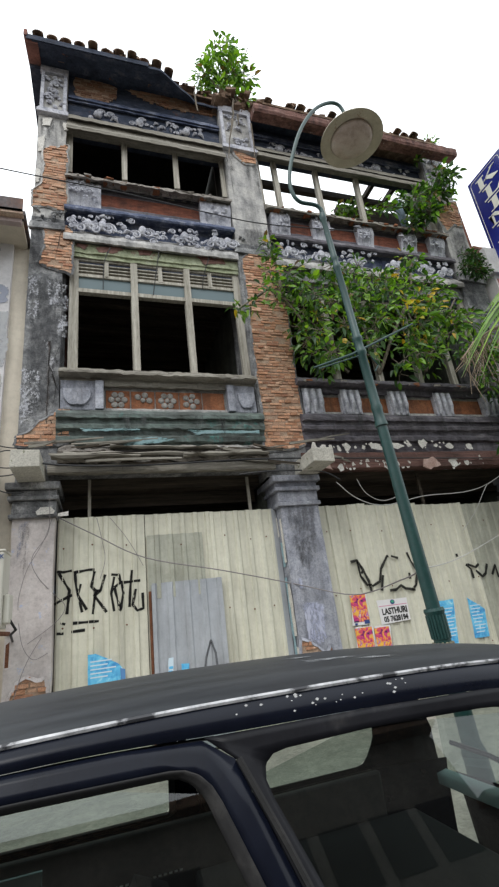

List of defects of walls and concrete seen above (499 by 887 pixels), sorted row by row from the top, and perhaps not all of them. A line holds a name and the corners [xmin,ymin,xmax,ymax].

flaking render [73,77,117,103]
flaking render [128,89,217,117]
flaking render [30,117,70,213]
flaking render [38,225,123,276]
damp [19,275,68,423]
flaking render [189,254,480,472]
flaking render [12,407,72,449]
peeling [80,428,173,445]
peeling [276,518,335,654]
flaking render [6,675,50,701]